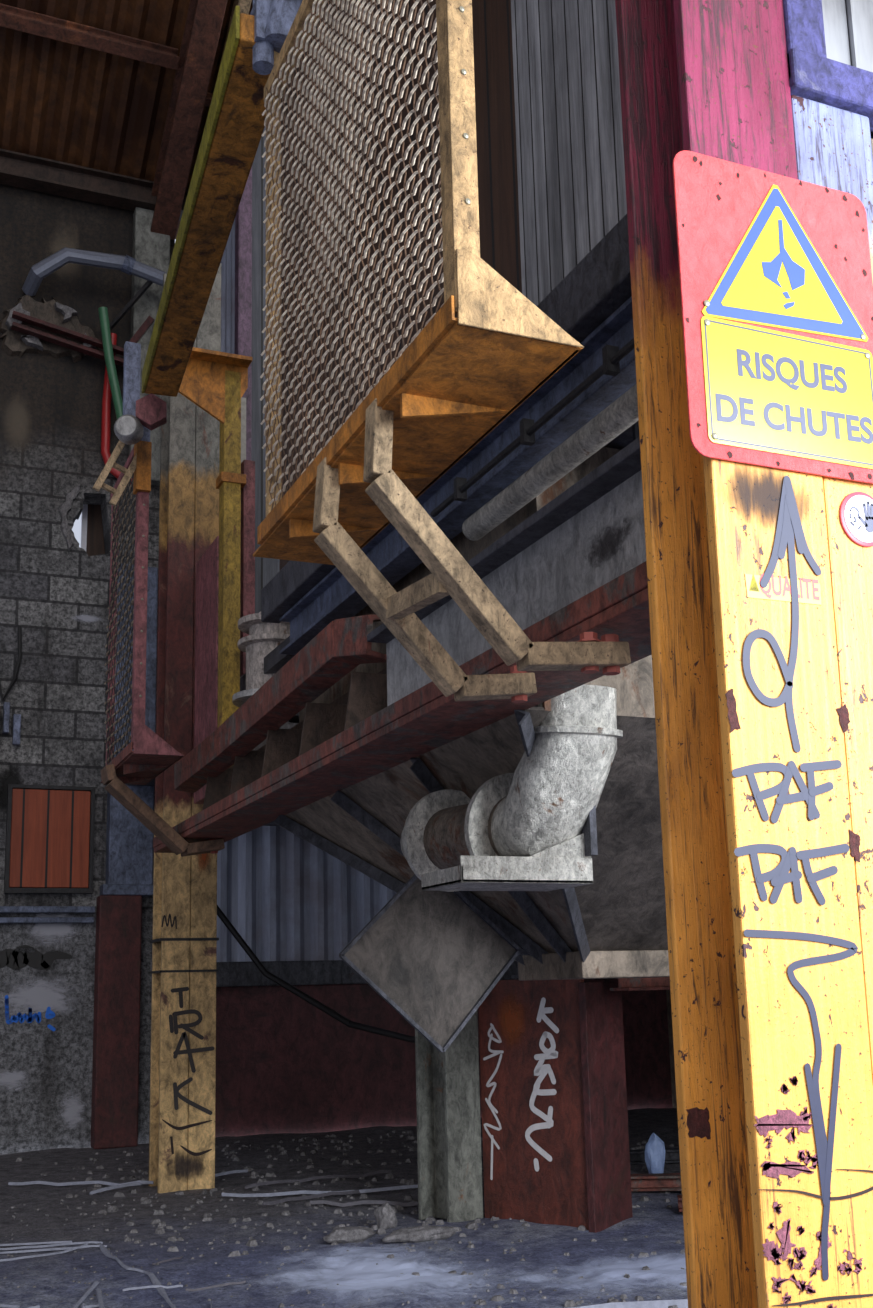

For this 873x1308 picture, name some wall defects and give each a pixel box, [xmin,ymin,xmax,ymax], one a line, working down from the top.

spalling [0,295,100,363]
peeling [781,1076,798,1094]
peeling [754,1107,818,1179]
peeling [762,1202,864,1304]